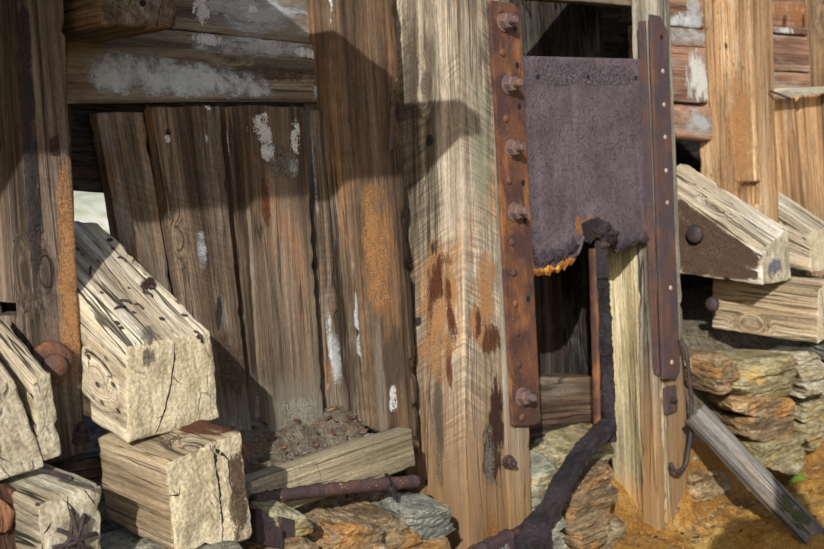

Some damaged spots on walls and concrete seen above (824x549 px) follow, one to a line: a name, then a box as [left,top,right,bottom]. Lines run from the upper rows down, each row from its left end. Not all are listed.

water stain [90,54,317,98]
water stain [192,0,314,59]
water stain [670,0,710,132]
water stain [247,113,300,227]